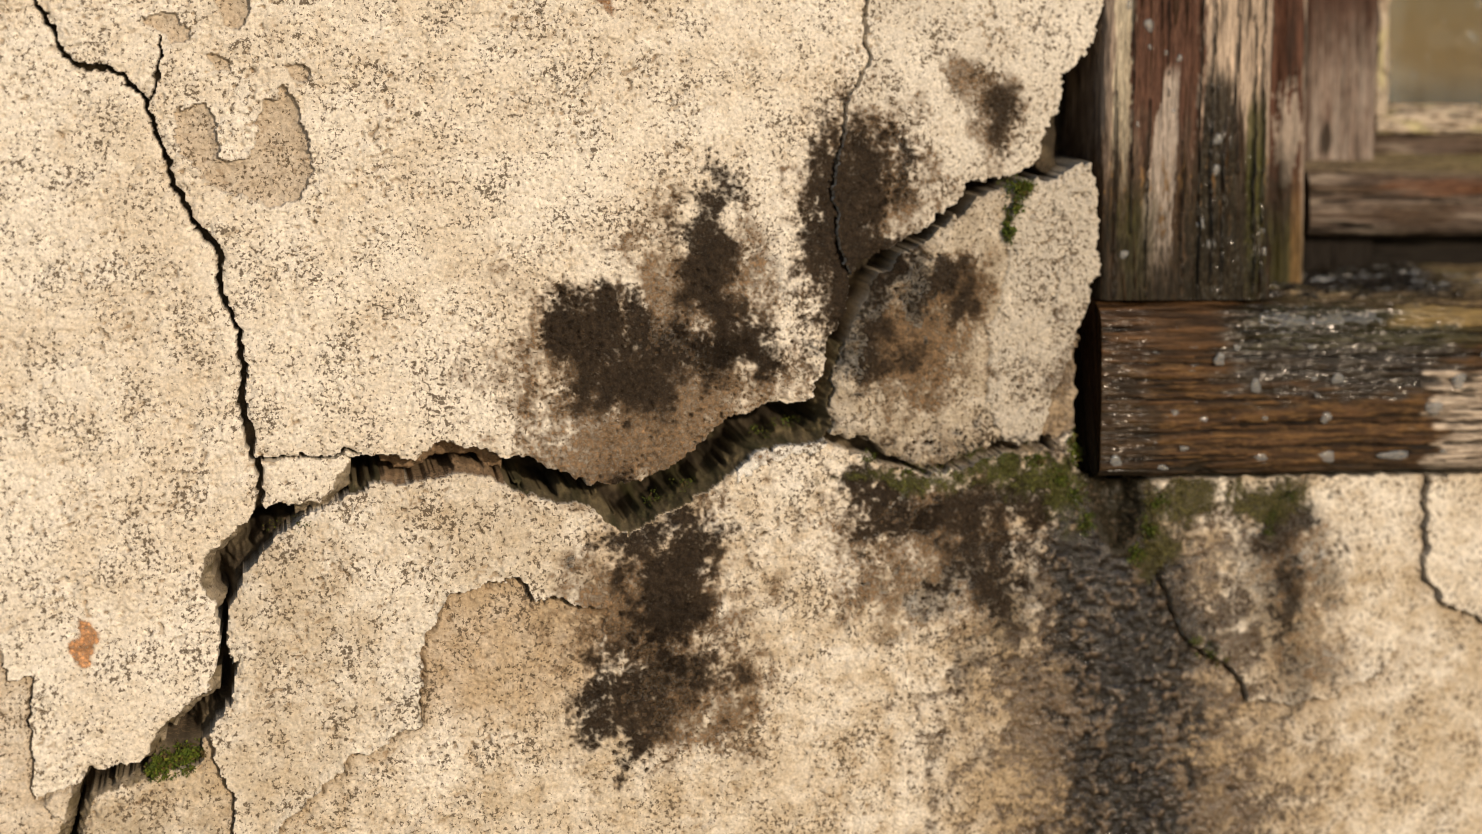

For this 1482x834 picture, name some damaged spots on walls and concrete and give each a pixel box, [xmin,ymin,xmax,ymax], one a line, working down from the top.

corrosion [69,620,99,668]
crack [32,0,1055,834]
leakage [449,87,1359,834]
leakage [943,58,1030,166]